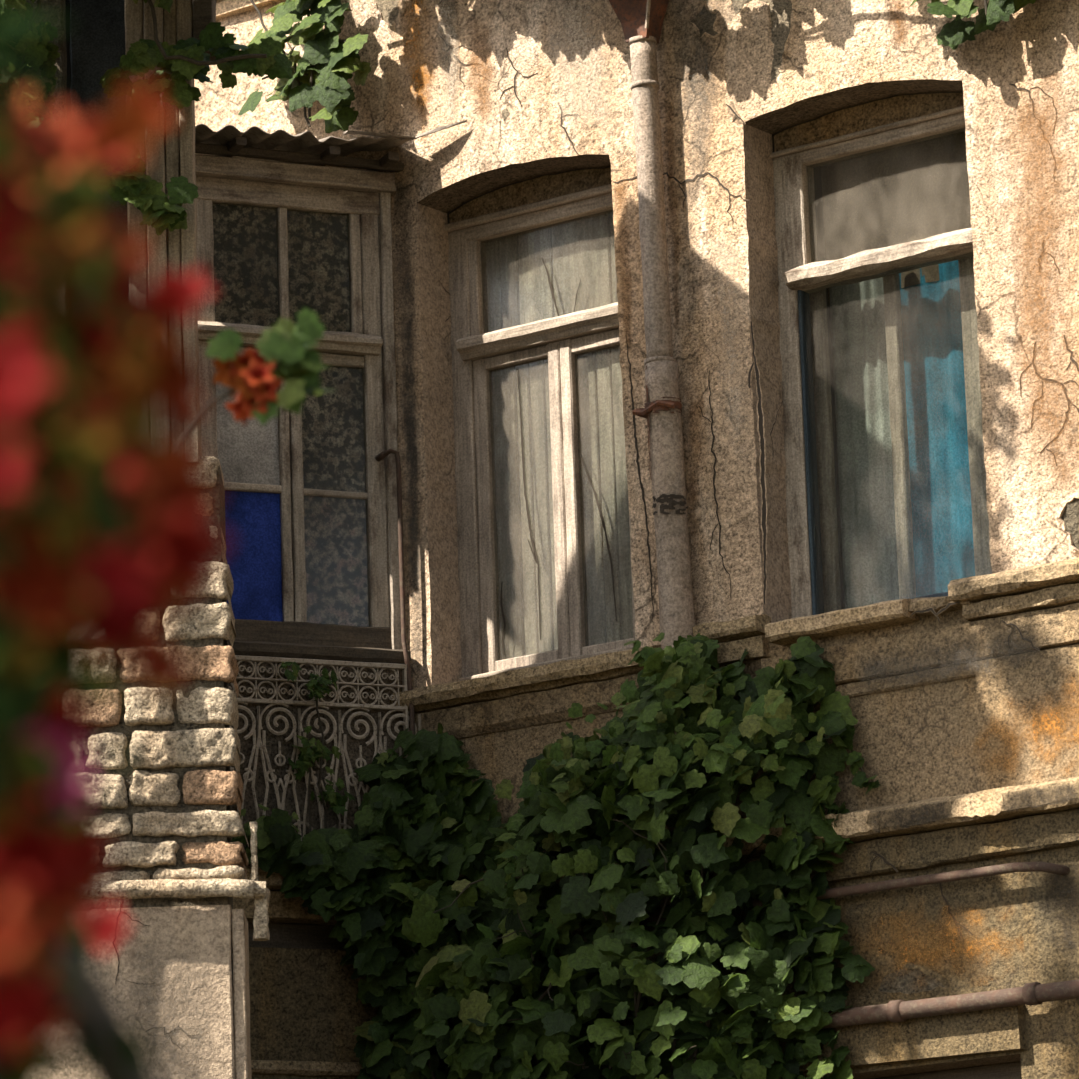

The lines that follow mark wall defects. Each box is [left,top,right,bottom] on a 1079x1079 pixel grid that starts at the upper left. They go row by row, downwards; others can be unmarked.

flaking render [367,0,407,37]
crack [437,32,538,106]
flaking render [684,0,798,82]
crack [1009,83,1057,182]
crack [663,171,749,222]
crack [1037,240,1060,274]
crack [625,335,654,619]
corrosion [644,366,682,477]
crack [698,371,732,597]
crack [747,321,783,604]
crack [1019,335,1079,466]
flaking render [1054,492,1079,556]